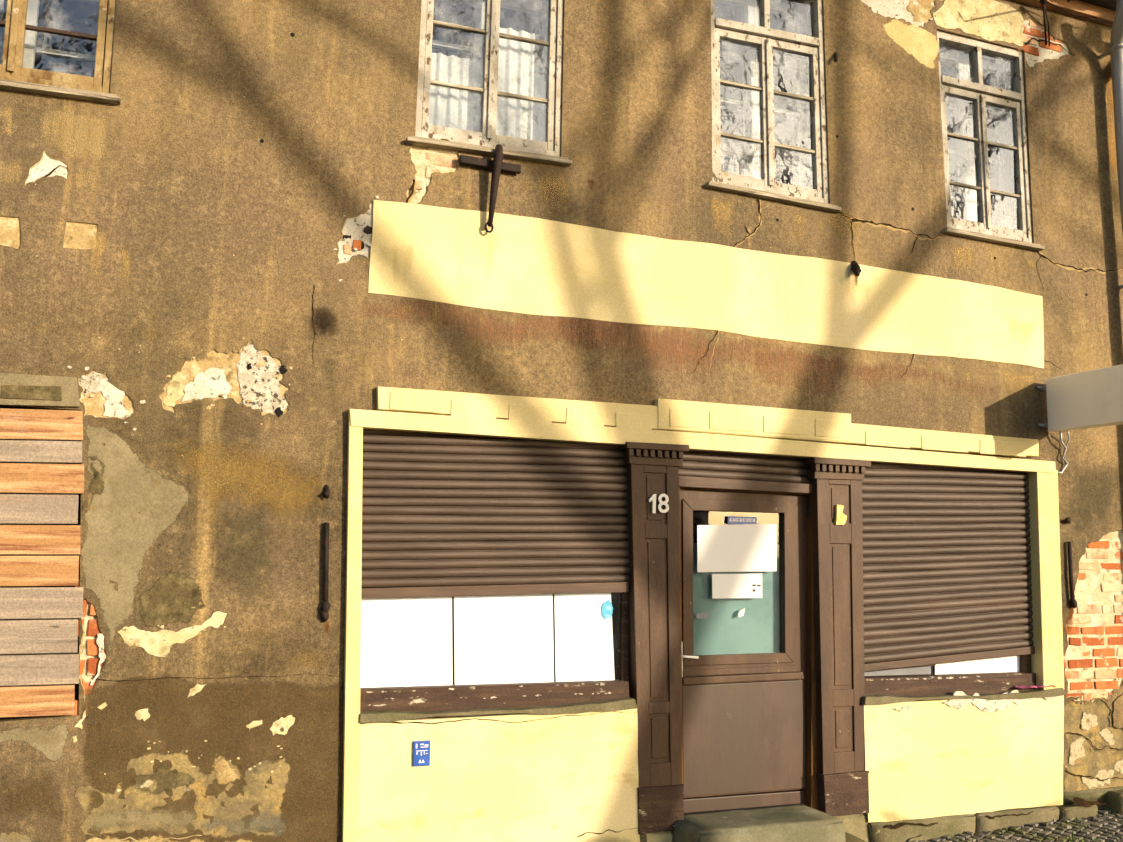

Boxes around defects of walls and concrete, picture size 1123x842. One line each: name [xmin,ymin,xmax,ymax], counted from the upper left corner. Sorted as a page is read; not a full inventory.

peeling [861,0,1076,69]
spalling [406,139,459,204]
spalling [333,195,379,265]
crack [734,199,762,247]
crack [838,212,941,261]
crack [1036,251,1123,289]
peeling [68,365,146,430]
peeling [159,338,293,425]
spalling [118,570,227,657]
spalling [65,579,107,742]
spalling [867,530,1123,792]
peeling [75,715,295,842]